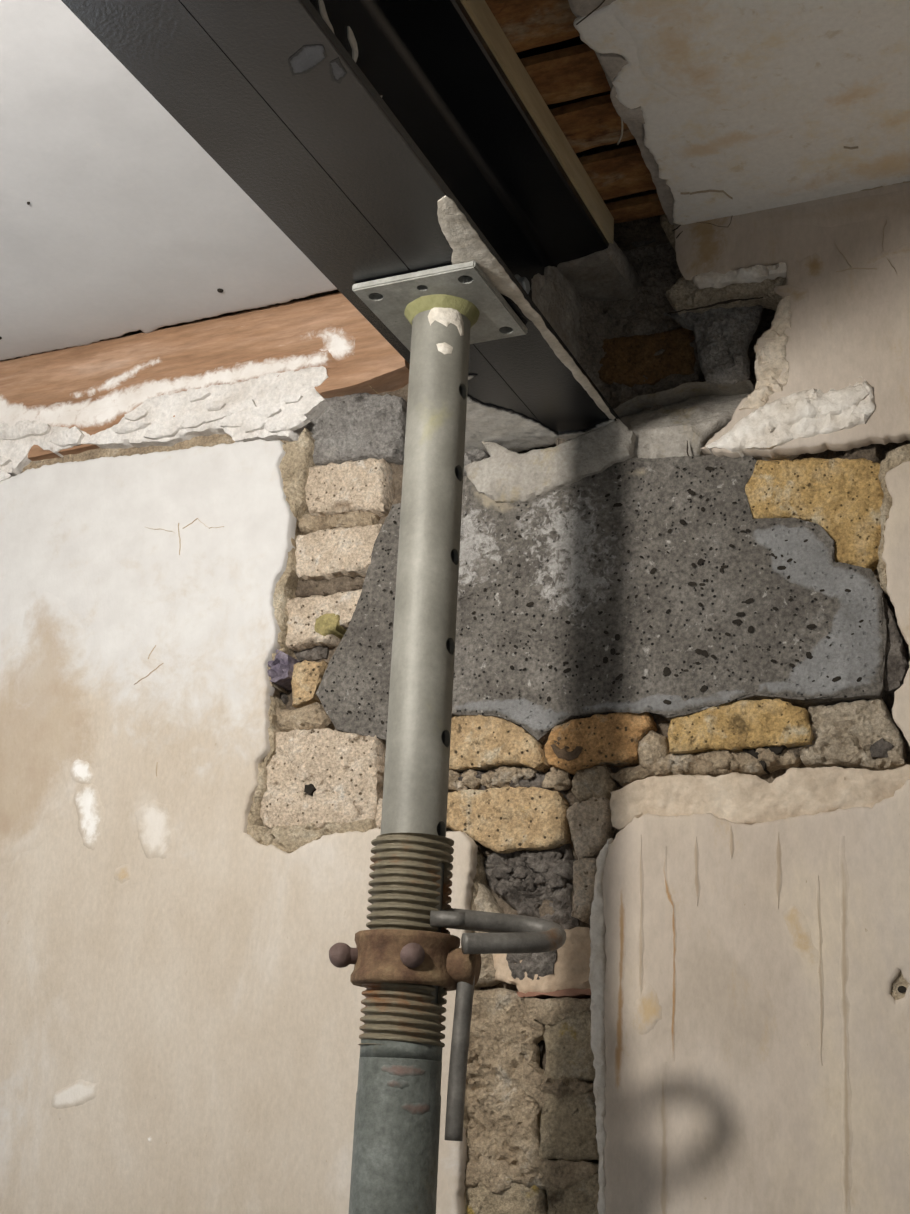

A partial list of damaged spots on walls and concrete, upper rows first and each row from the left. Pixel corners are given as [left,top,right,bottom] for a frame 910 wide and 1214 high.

flaking render [568,0,616,17]
damp [0,592,106,864]
flaking render [0,366,407,853]
flaking render [446,51,910,1214]